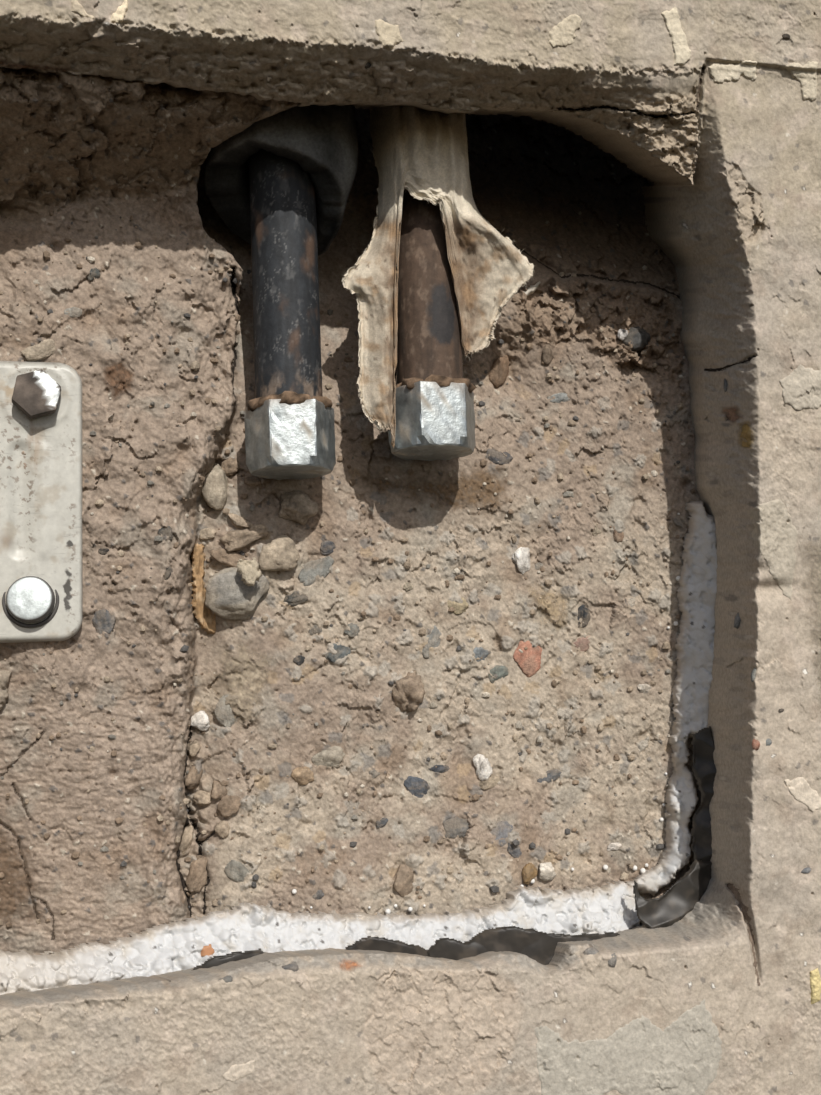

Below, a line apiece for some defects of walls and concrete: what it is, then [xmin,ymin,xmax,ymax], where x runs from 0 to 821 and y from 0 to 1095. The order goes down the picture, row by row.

crack [551,105,695,118]
rust [396,375,476,393]
crack [0,731,55,940]
crack [176,726,215,917]